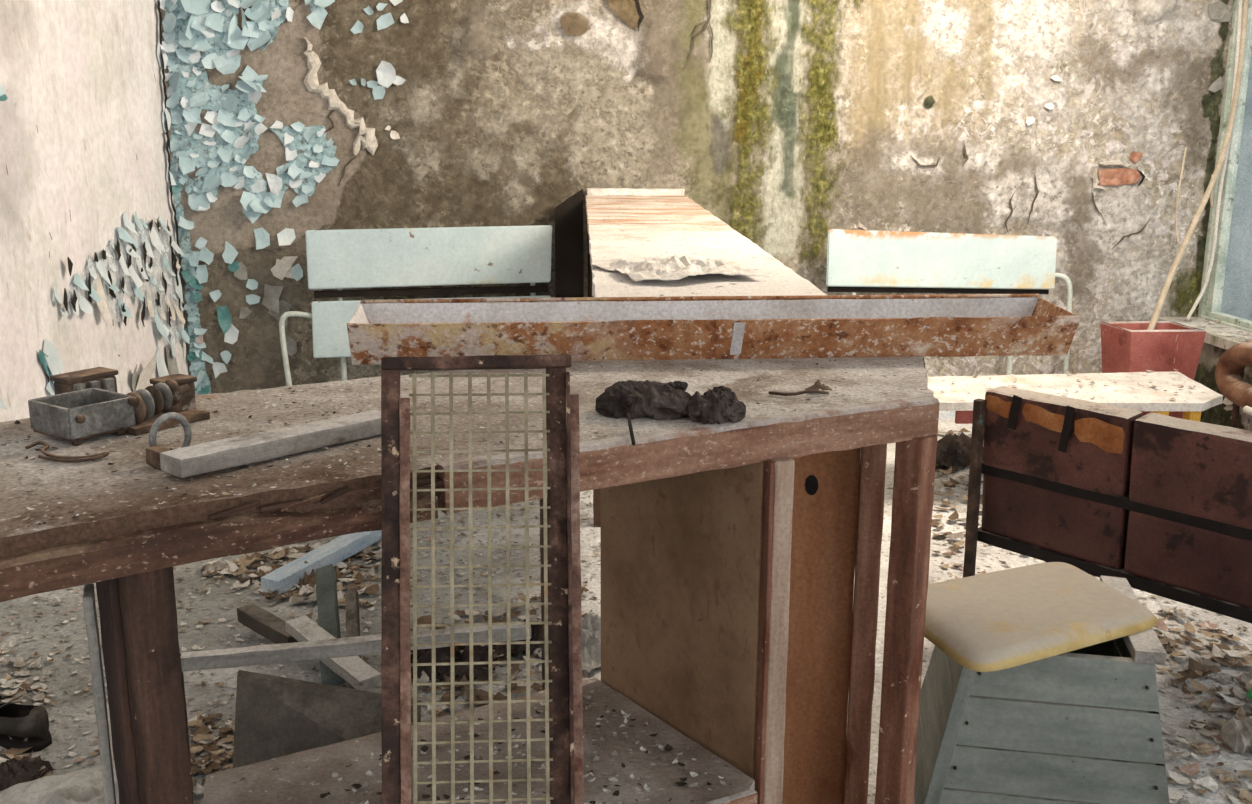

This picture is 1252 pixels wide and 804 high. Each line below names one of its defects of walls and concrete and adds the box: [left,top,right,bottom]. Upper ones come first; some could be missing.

flaking render [560,12,591,36]
flaking render [607,0,645,32]
water stain [759,0,808,256]
flaking render [1092,151,1145,191]
flaking render [54,0,409,395]